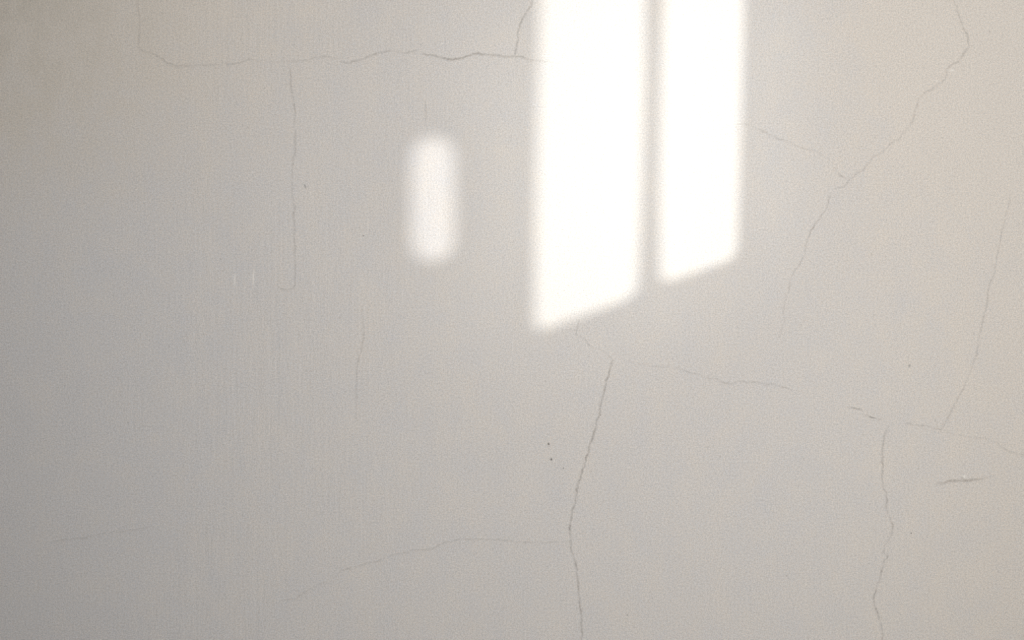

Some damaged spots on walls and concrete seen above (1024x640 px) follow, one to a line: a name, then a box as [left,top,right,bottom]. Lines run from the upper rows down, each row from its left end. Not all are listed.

crack [136,0,559,291]
crack [778,0,970,339]
crack [845,405,895,640]